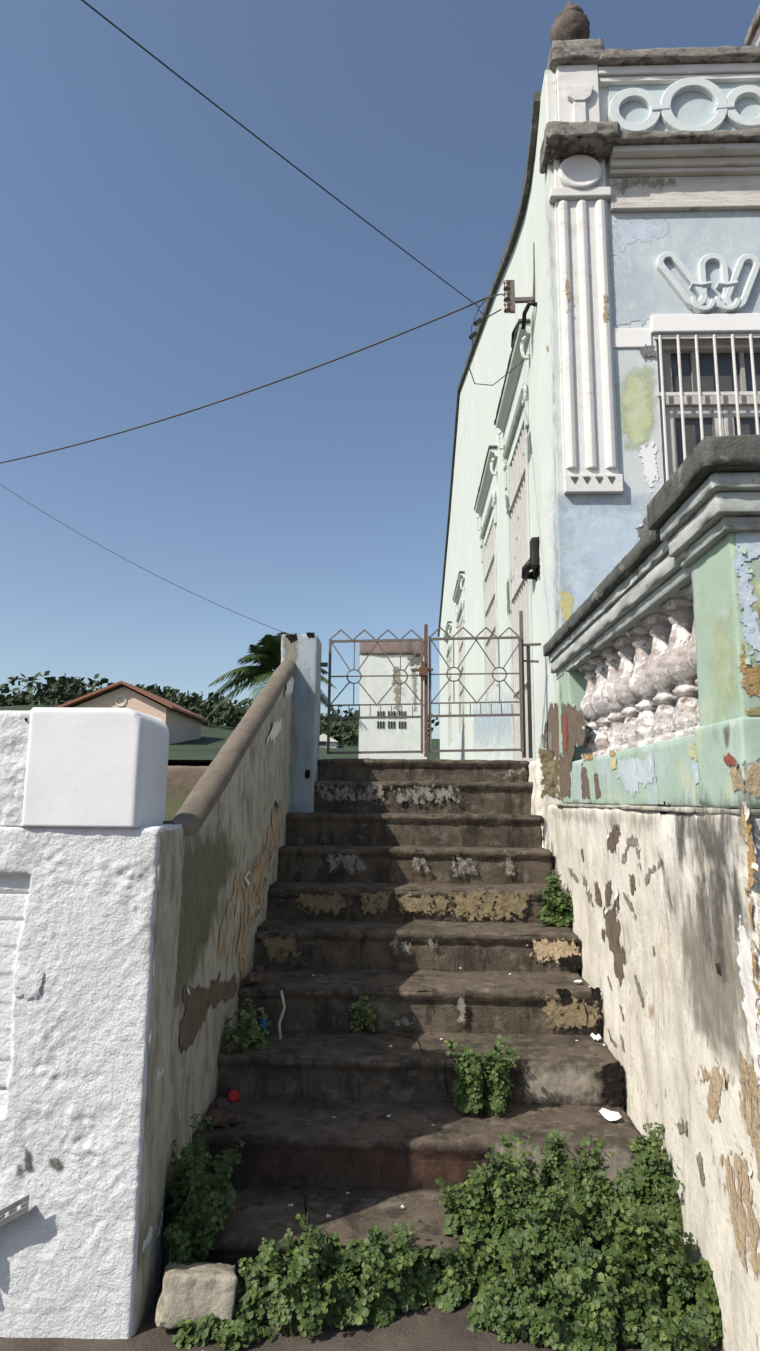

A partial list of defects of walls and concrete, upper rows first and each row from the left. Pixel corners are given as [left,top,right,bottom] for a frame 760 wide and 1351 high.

peeling [609,210,760,328]
peeling [532,344,659,623]
peeling [733,532,760,716]
peeling [538,702,656,801]
spalling [179,870,250,1055]
flaking render [259,934,301,962]
peeling [293,885,533,921]
spalling [526,938,583,970]
spalling [542,823,662,1104]
leakage [662,789,752,1058]
flaking render [694,758,760,1280]